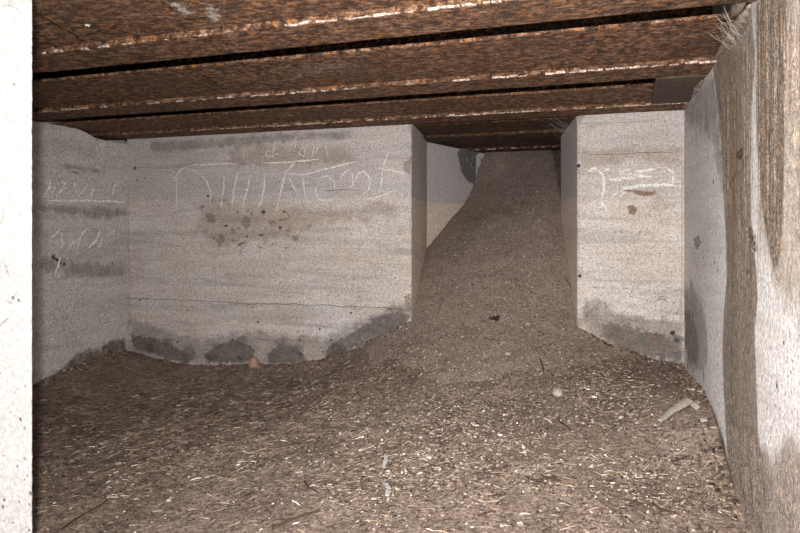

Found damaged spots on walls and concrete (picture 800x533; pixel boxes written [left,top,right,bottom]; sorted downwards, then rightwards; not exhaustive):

water stain [205,339,254,363]
water stain [602,172,683,364]